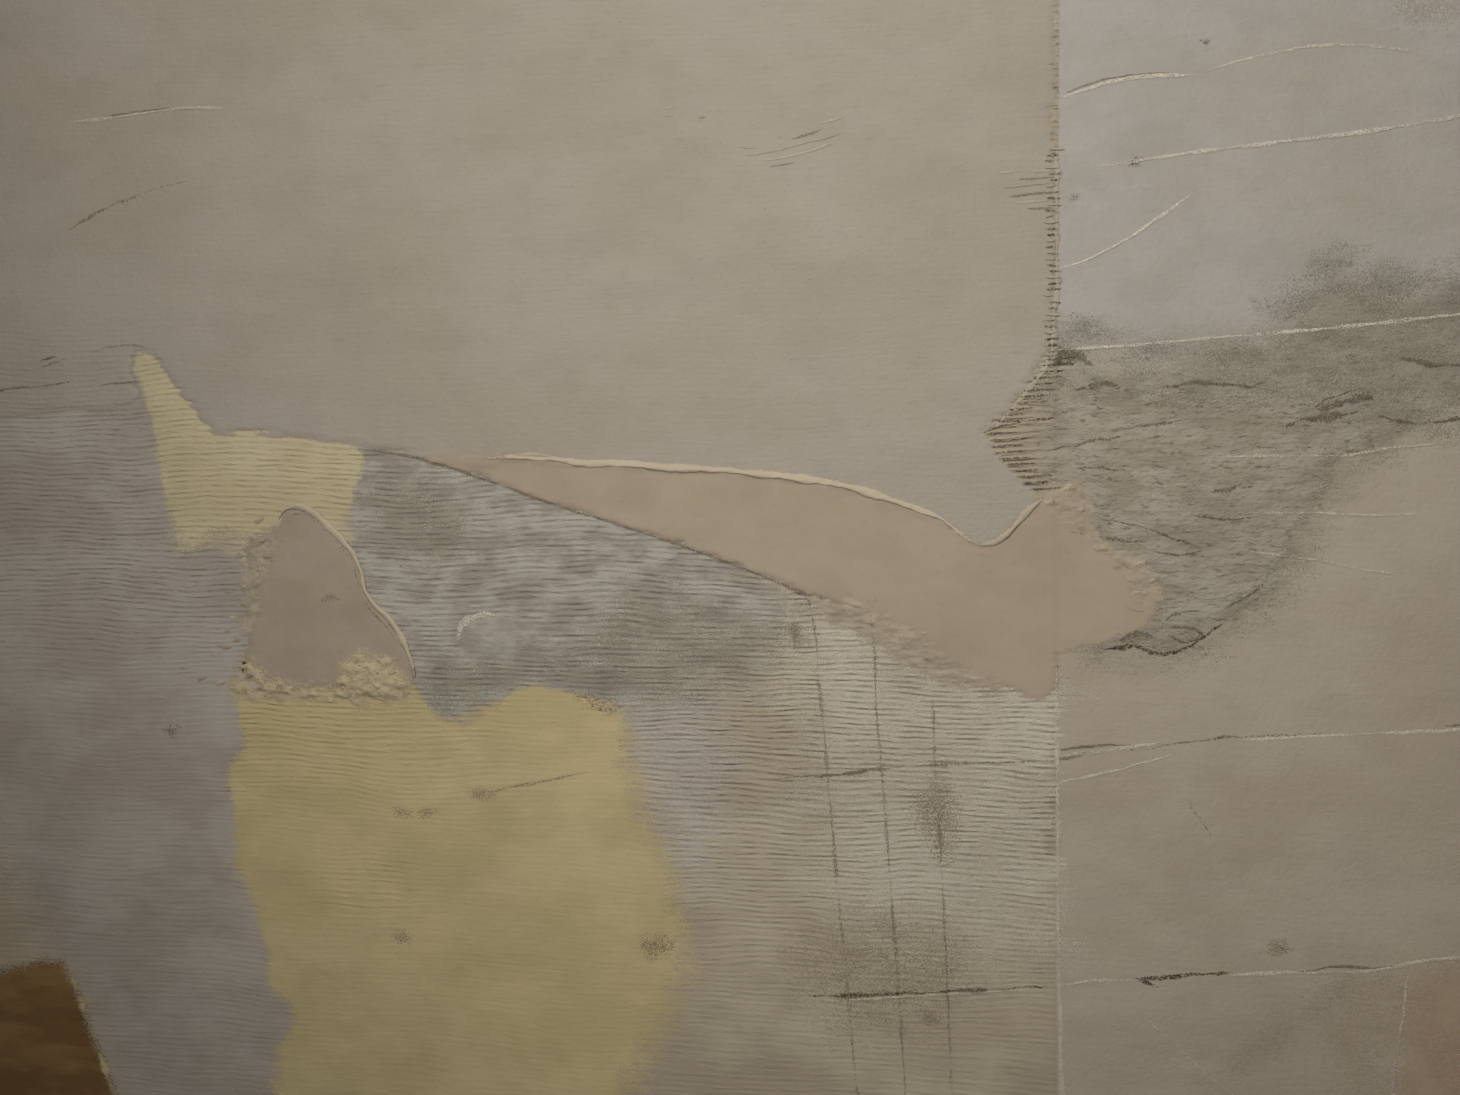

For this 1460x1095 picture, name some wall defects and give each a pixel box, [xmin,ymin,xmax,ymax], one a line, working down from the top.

water stain [1030,238,1460,449]
spalling [197,630,418,716]
spalling [800,589,1011,697]
crack [774,724,1460,784]
peeling [0,955,118,1095]
crack [808,955,1460,1001]